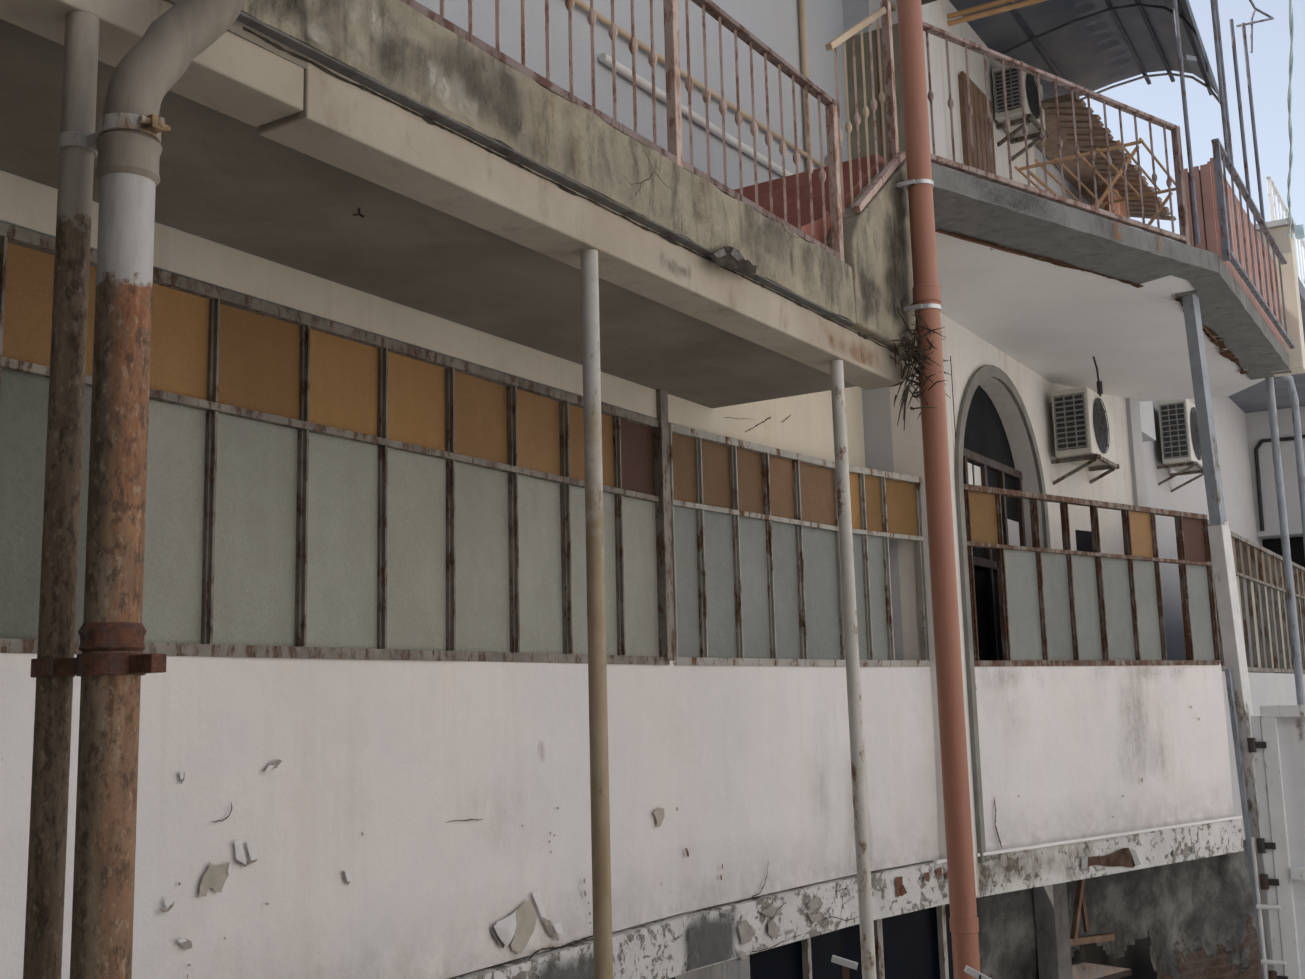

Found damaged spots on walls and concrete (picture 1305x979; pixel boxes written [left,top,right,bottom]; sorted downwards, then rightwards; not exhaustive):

damp [863,179,906,320]
peeling [653,807,678,827]
spalling [1082,848,1141,869]
peeling [199,862,232,896]
peeling [896,876,907,897]
peeling [532,891,564,941]
peeling [737,907,794,960]